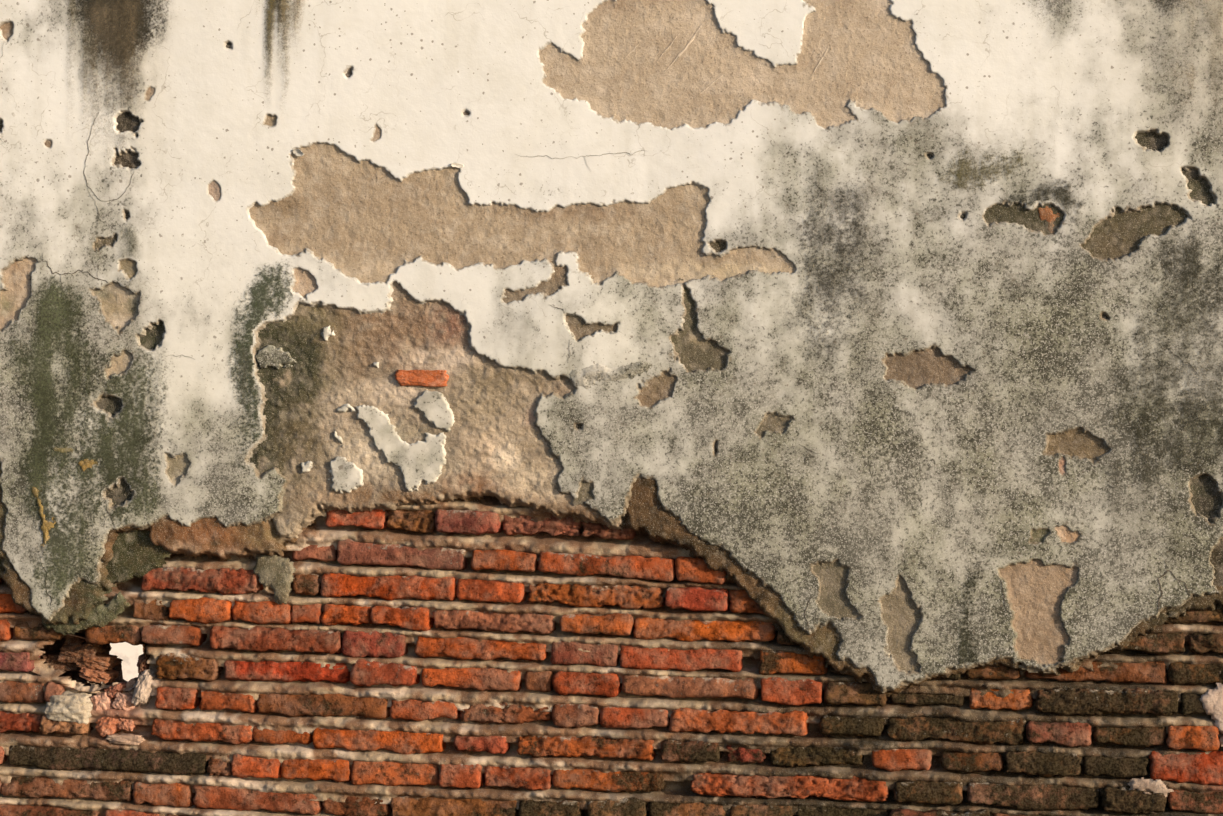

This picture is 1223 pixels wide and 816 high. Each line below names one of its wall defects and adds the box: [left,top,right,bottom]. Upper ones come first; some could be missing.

water stain [70,0,165,99]
water stain [265,0,300,72]
peeling [539,0,946,129]
water stain [1013,181,1086,221]
peeling [1081,168,1215,259]
water stain [789,189,877,359]
spalling [249,143,796,539]
peeling [884,347,973,389]
water stain [1111,236,1223,483]
water stain [959,563,982,664]
spalling [29,634,156,745]
spalling [1200,683,1223,747]